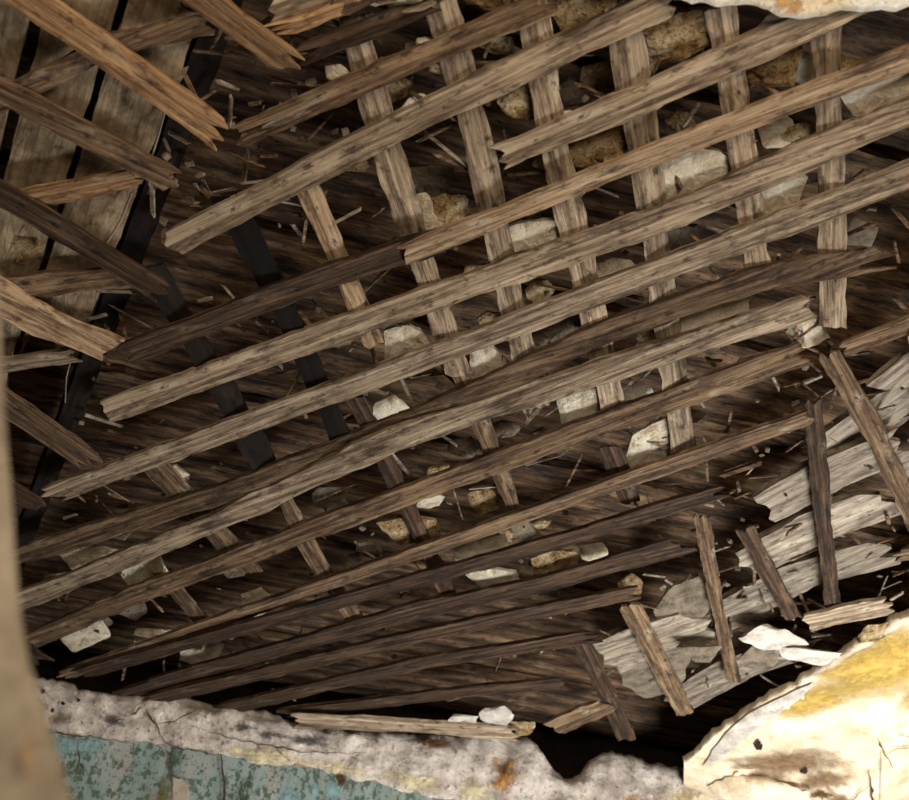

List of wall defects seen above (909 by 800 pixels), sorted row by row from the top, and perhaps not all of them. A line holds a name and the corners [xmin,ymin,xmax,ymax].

damp [781,630,909,717]
peeling [173,777,190,800]
crack [53,707,364,800]
damp [733,750,849,800]
crack [853,734,909,800]